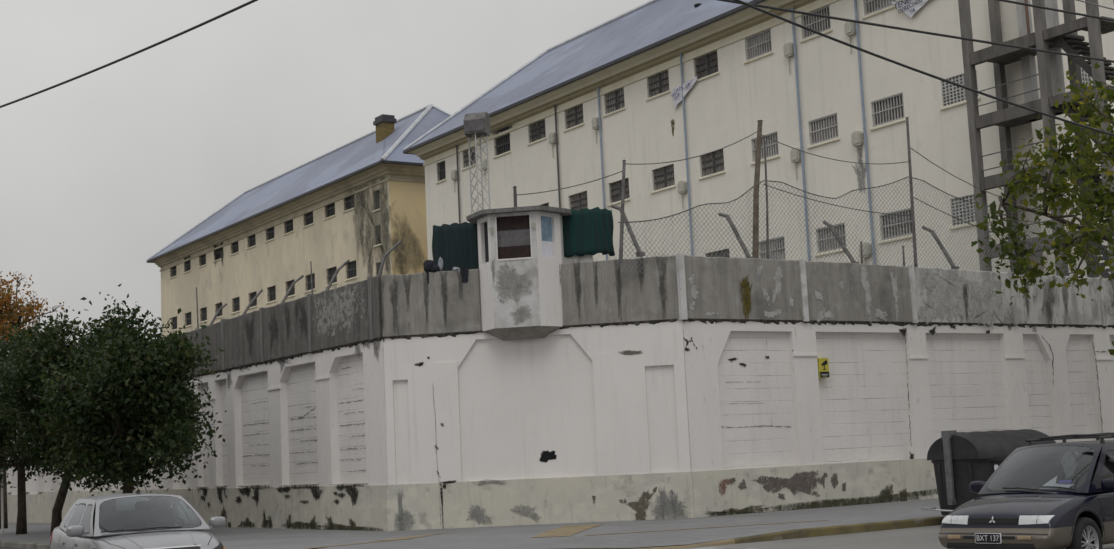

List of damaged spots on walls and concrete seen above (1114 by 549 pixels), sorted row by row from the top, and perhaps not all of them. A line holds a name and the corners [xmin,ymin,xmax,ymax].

damp [355,178,420,321]
spalling [724,470,846,499]
spalling [619,487,657,520]